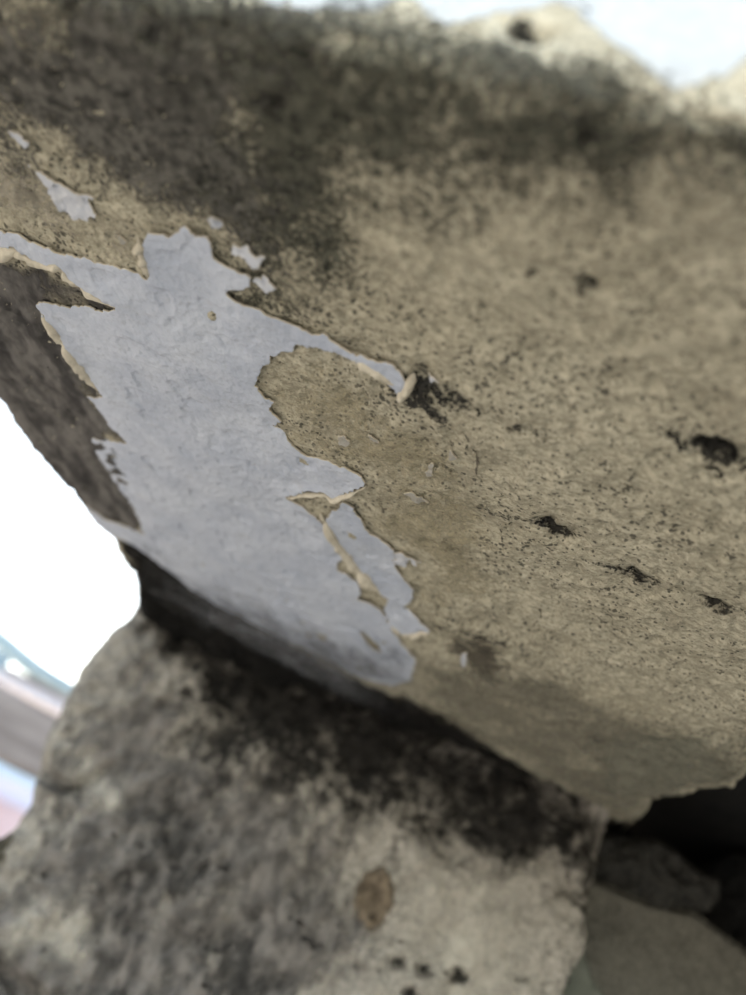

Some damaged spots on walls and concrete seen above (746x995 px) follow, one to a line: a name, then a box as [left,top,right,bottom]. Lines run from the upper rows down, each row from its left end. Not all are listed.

peeling [8,129,31,149]
peeling [27,163,97,222]
leakage [0,0,746,322]
leakage [0,263,141,533]
peeling [0,215,433,686]
leakage [388,361,481,426]
leakage [118,540,733,909]
leakage [11,794,208,959]